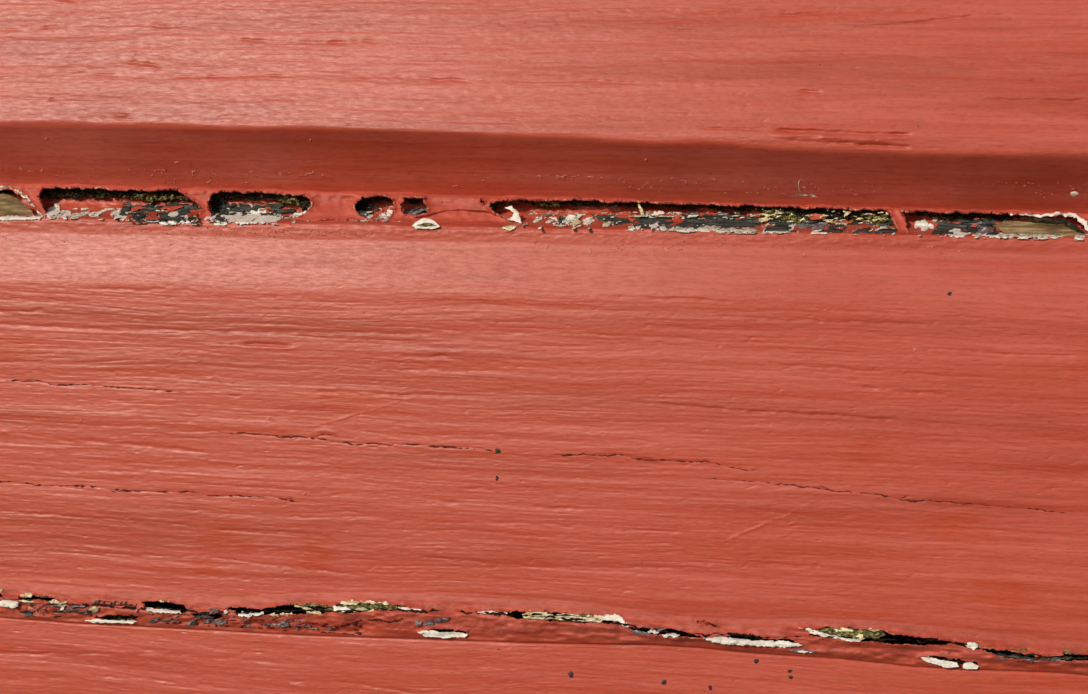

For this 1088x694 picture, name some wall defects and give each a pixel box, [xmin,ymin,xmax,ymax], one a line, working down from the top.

peeling [0,185,311,226]
peeling [354,196,440,229]
peeling [489,200,1088,240]
crack [6,379,185,393]
crack [218,431,492,451]
crack [0,481,298,502]
crack [556,453,1064,513]
peeling [0,600,19,608]
peeling [227,616,361,635]